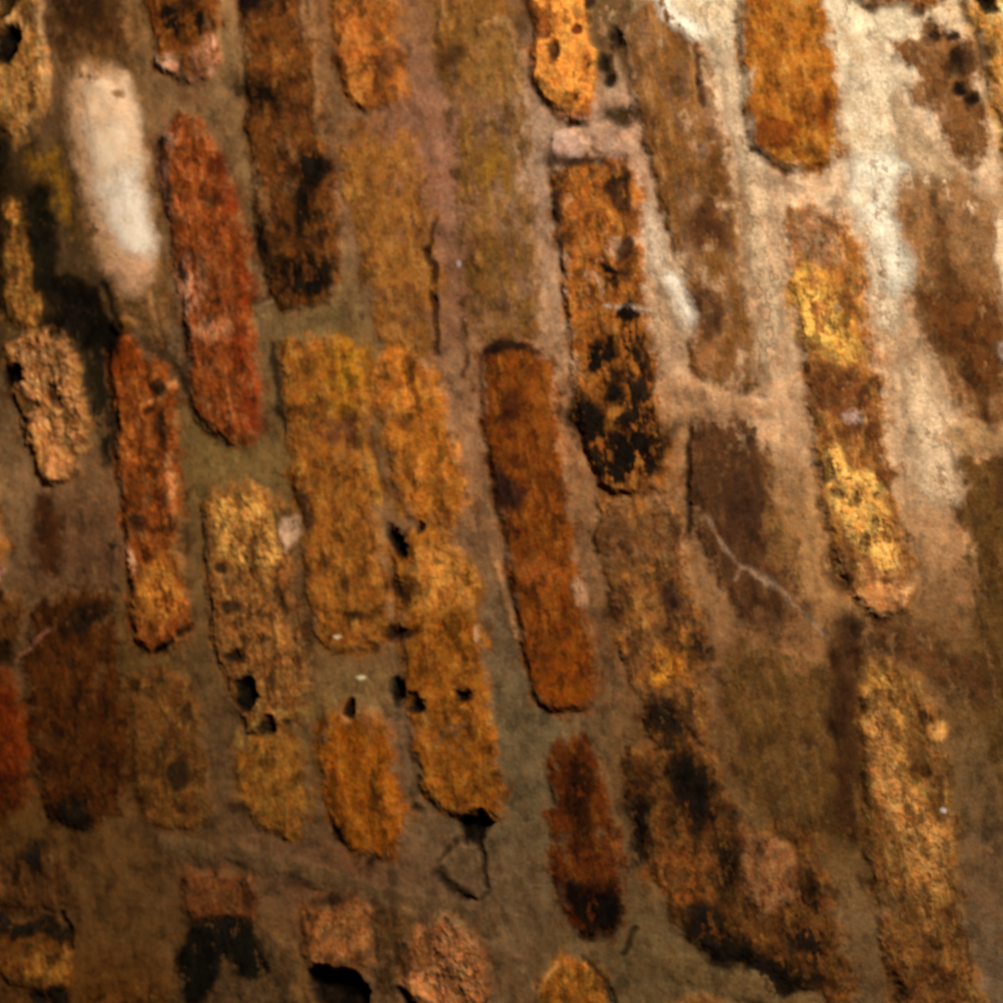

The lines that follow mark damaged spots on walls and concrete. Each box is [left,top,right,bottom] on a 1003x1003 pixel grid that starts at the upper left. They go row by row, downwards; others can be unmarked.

efflorescence [65,65,157,292]
efflorescence [656,0,782,364]
efflorescence [824,0,952,335]
efflorescence [645,204,697,362]
damp [919,197,1003,423]
spalling [5,334,83,482]
efflorescence [902,356,959,504]
hole [311,966,371,1003]
spalling [403,925,483,1003]